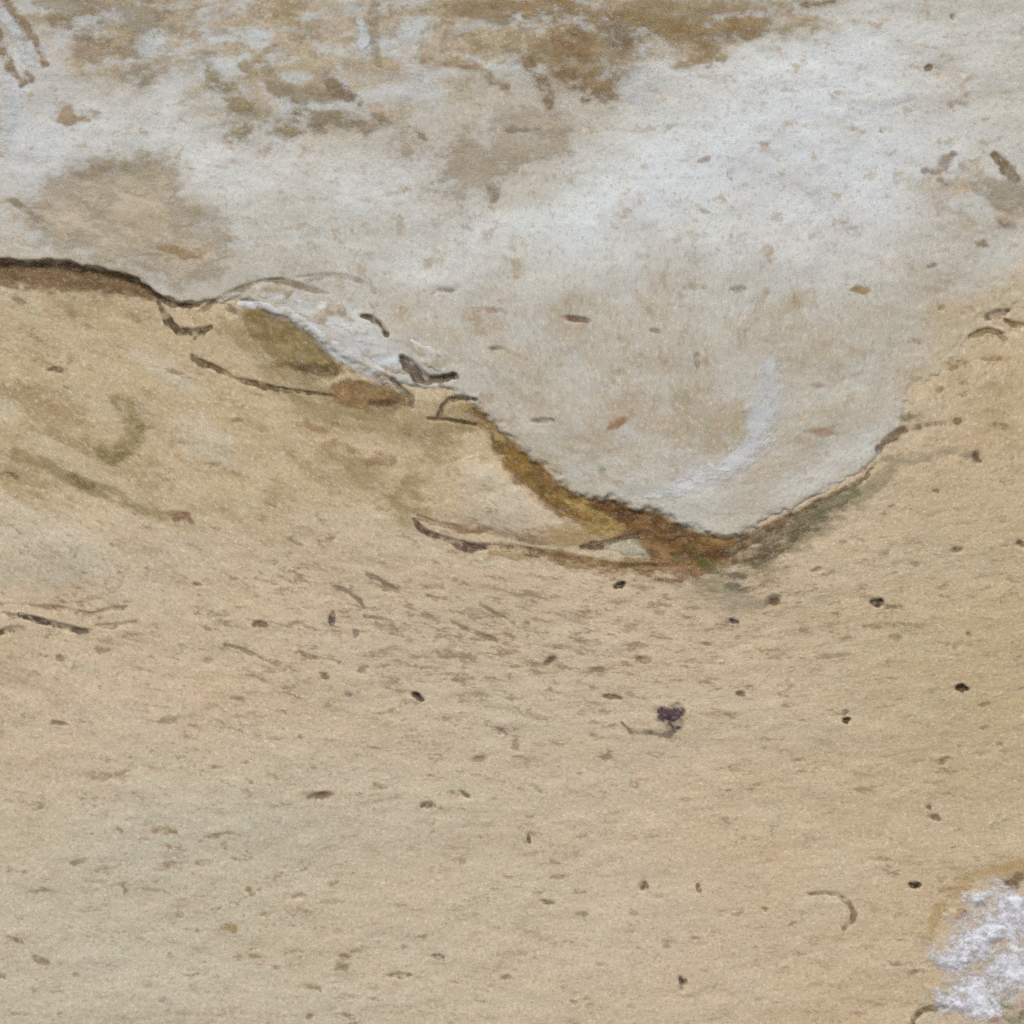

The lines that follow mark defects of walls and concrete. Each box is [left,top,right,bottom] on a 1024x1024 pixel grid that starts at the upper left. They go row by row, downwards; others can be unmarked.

leakage [356,2,380,66]
leakage [206,69,253,138]
leakage [238,60,388,137]
leakage [435,108,570,202]
flaking render [0,0,1024,554]
crack [0,258,328,396]
efflorescence [646,357,783,498]
leakage [528,522,626,546]
spalling [607,534,653,561]
leakage [694,455,903,595]
leakage [922,859,1024,1022]